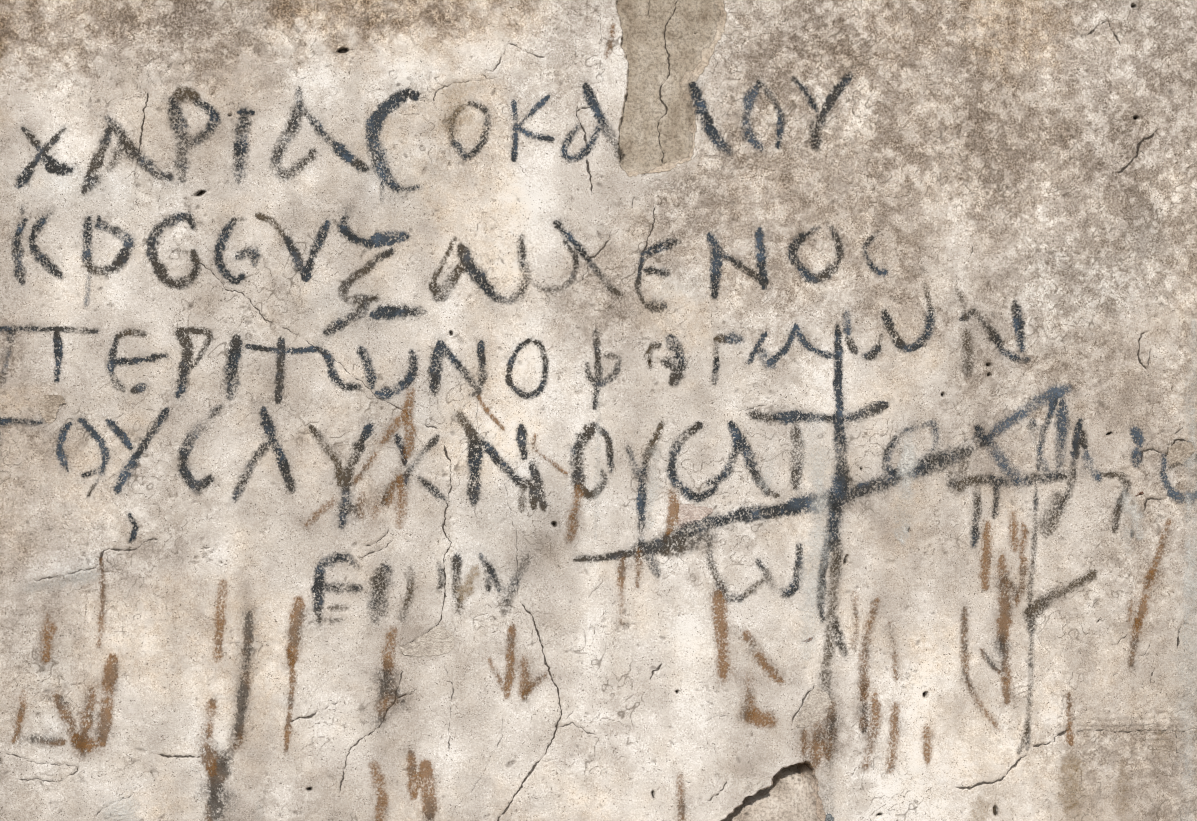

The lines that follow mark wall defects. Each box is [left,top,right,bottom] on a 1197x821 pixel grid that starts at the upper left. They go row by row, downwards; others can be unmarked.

spalling [616,0,727,177]
crack [201,263,452,642]
crack [38,538,156,581]
crack [340,672,406,791]
crack [497,604,593,821]
spalling [721,761,826,821]